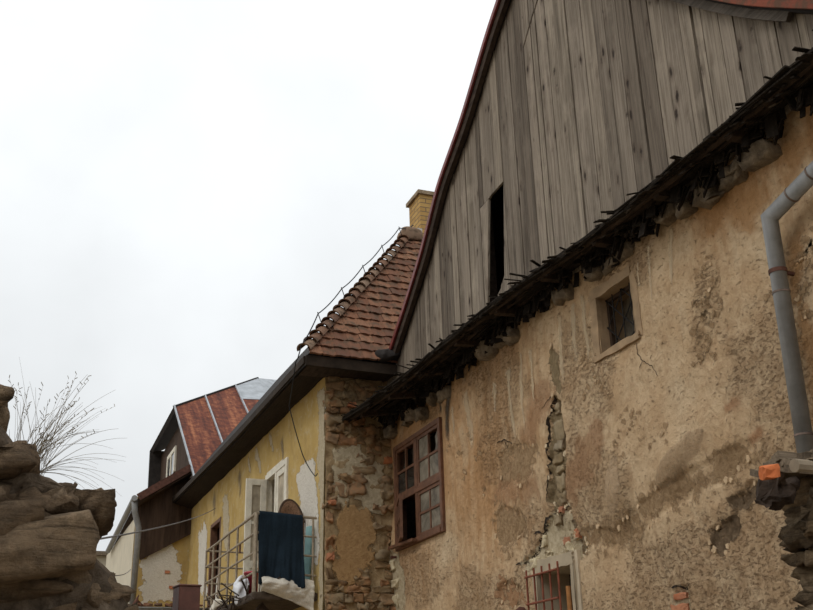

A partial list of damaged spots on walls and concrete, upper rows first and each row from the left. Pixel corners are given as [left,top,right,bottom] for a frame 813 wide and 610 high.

peeling [138,544,183,604]
peeling [296,387,385,610]
spalling [389,551,405,610]
spalling [491,342,768,577]